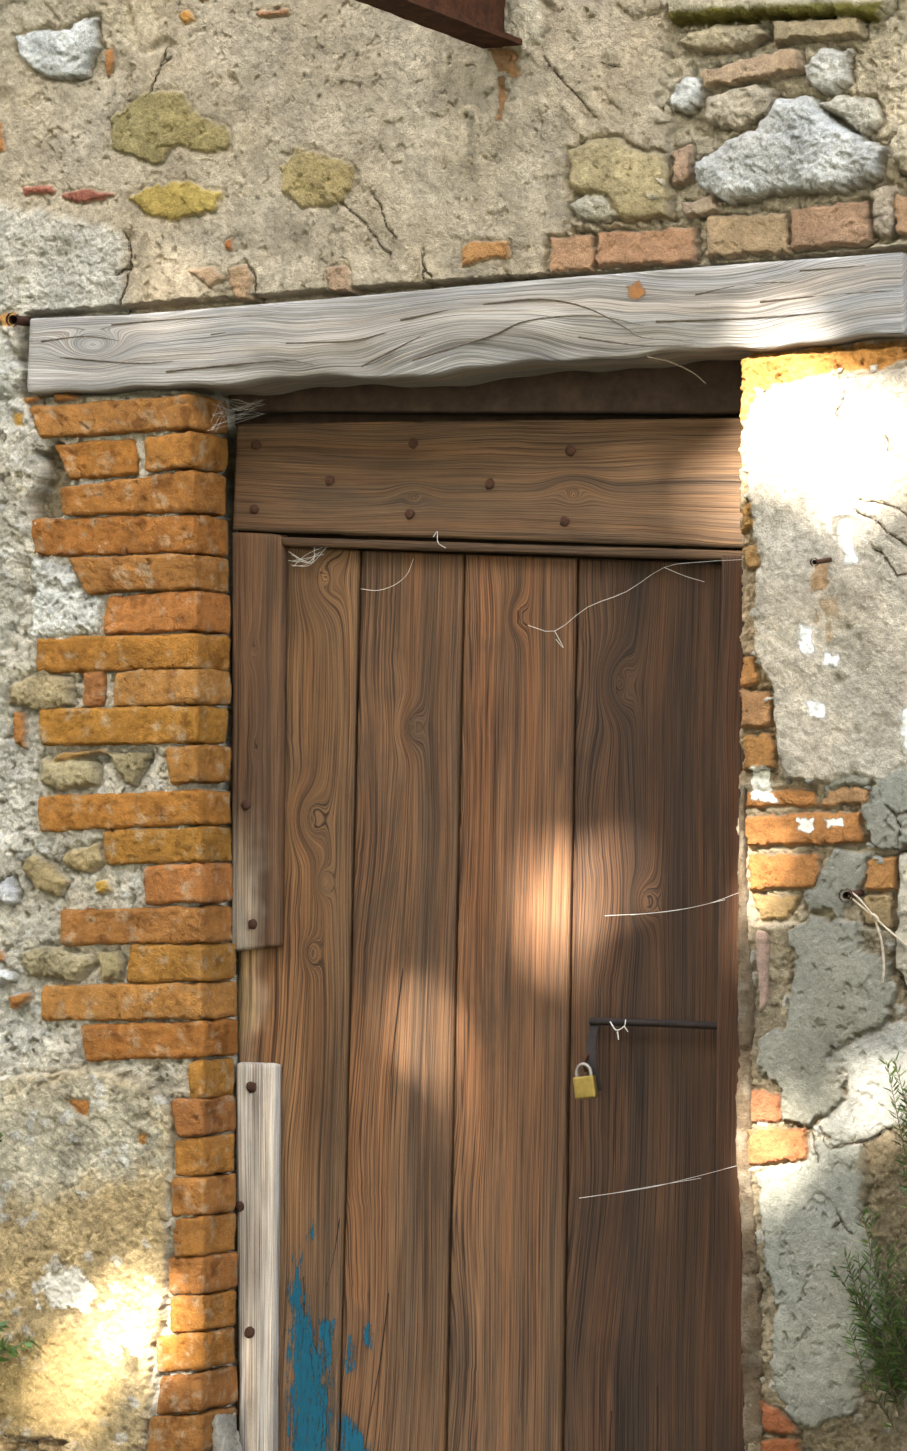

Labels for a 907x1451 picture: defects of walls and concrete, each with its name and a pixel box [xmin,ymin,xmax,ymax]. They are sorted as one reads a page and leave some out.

spalling [544,236,553,274]
spalling [572,0,907,275]
spalling [738,339,907,930]
crack [833,499,907,578]